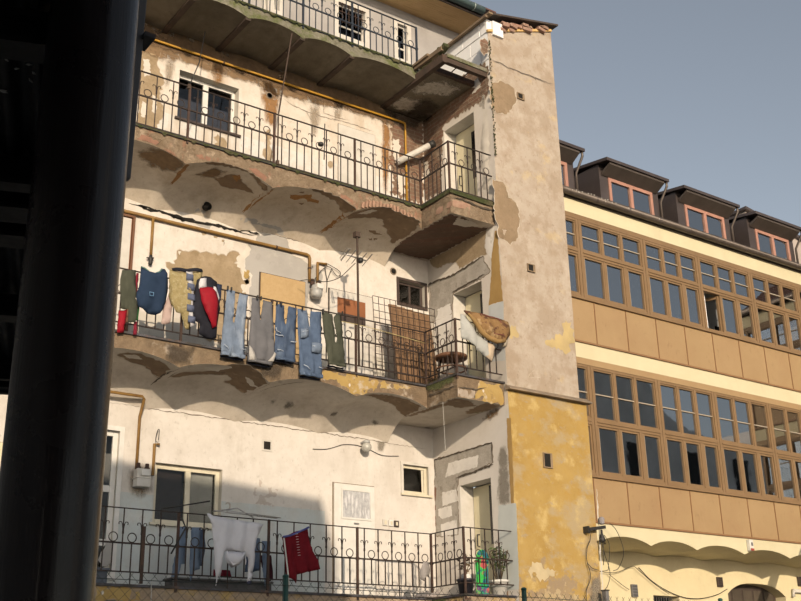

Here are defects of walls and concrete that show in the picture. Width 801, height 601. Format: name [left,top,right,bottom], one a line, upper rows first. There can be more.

flaking render [136,51,165,128]
peeling [262,129,273,161]
crack [129,190,300,242]
spalling [196,154,274,194]
crack [320,209,356,233]
flaking render [290,38,525,351]
spalling [165,244,251,345]
spalling [117,352,271,395]
spalling [322,370,504,417]
spalling [543,452,553,469]
spalling [528,562,555,582]